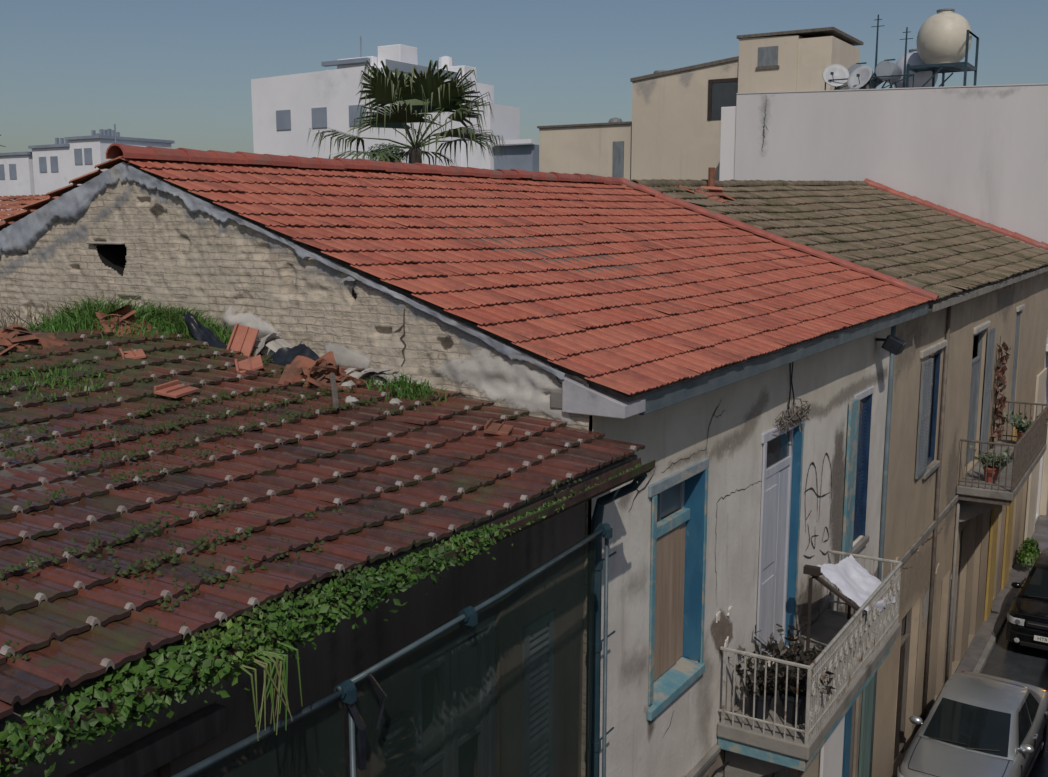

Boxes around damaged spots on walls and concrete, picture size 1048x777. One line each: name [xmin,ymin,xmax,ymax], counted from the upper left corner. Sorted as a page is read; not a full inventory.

crack [761,95,769,148]
spalling [86,241,127,276]
crack [394,309,406,366]
leakage [717,395,768,456]
crack [628,399,725,513]
crack [715,480,762,599]
peeling [711,606,733,659]